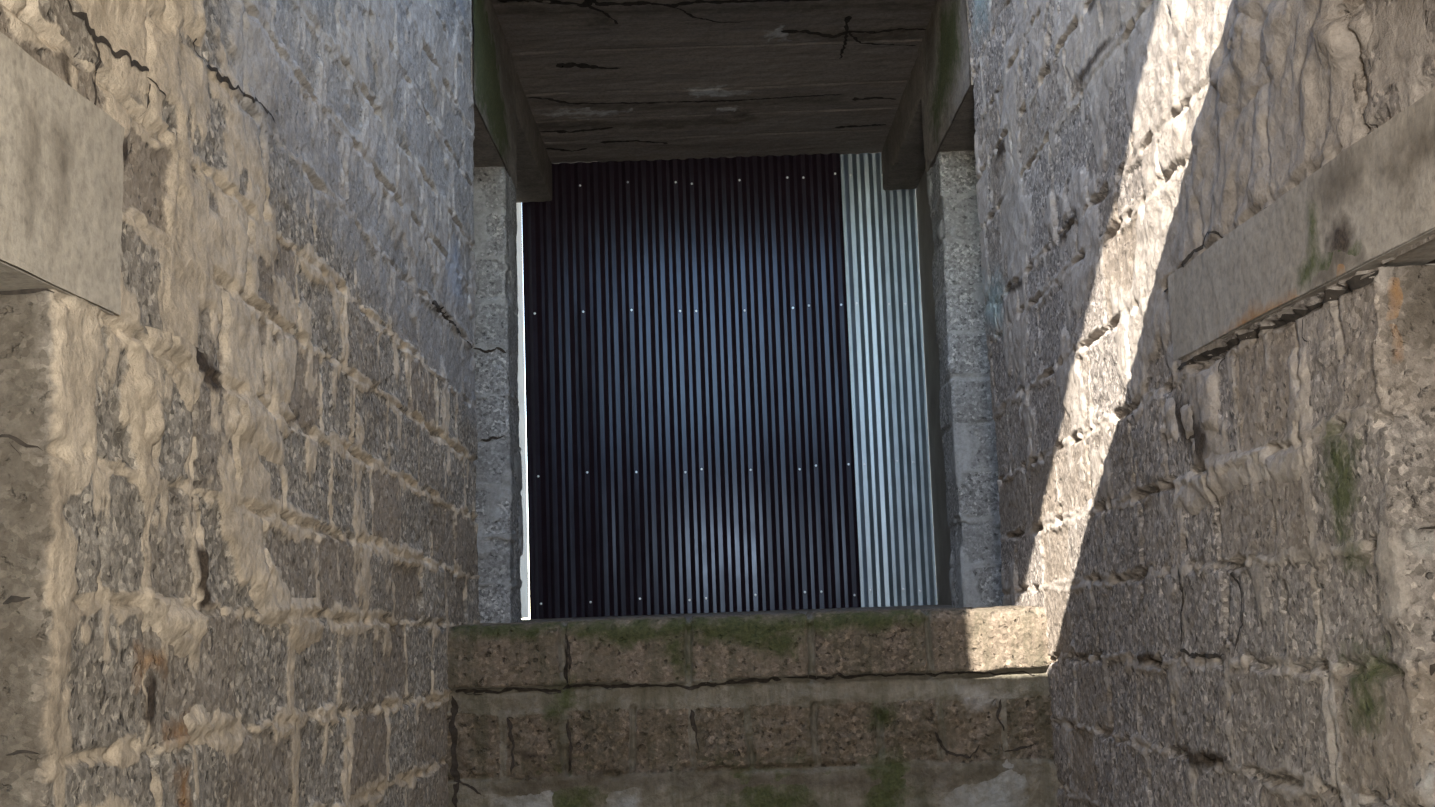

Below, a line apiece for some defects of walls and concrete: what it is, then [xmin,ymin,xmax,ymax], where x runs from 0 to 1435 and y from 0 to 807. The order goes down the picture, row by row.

crack [67,0,166,108]
crack [498,0,926,59]
crack [529,62,896,151]